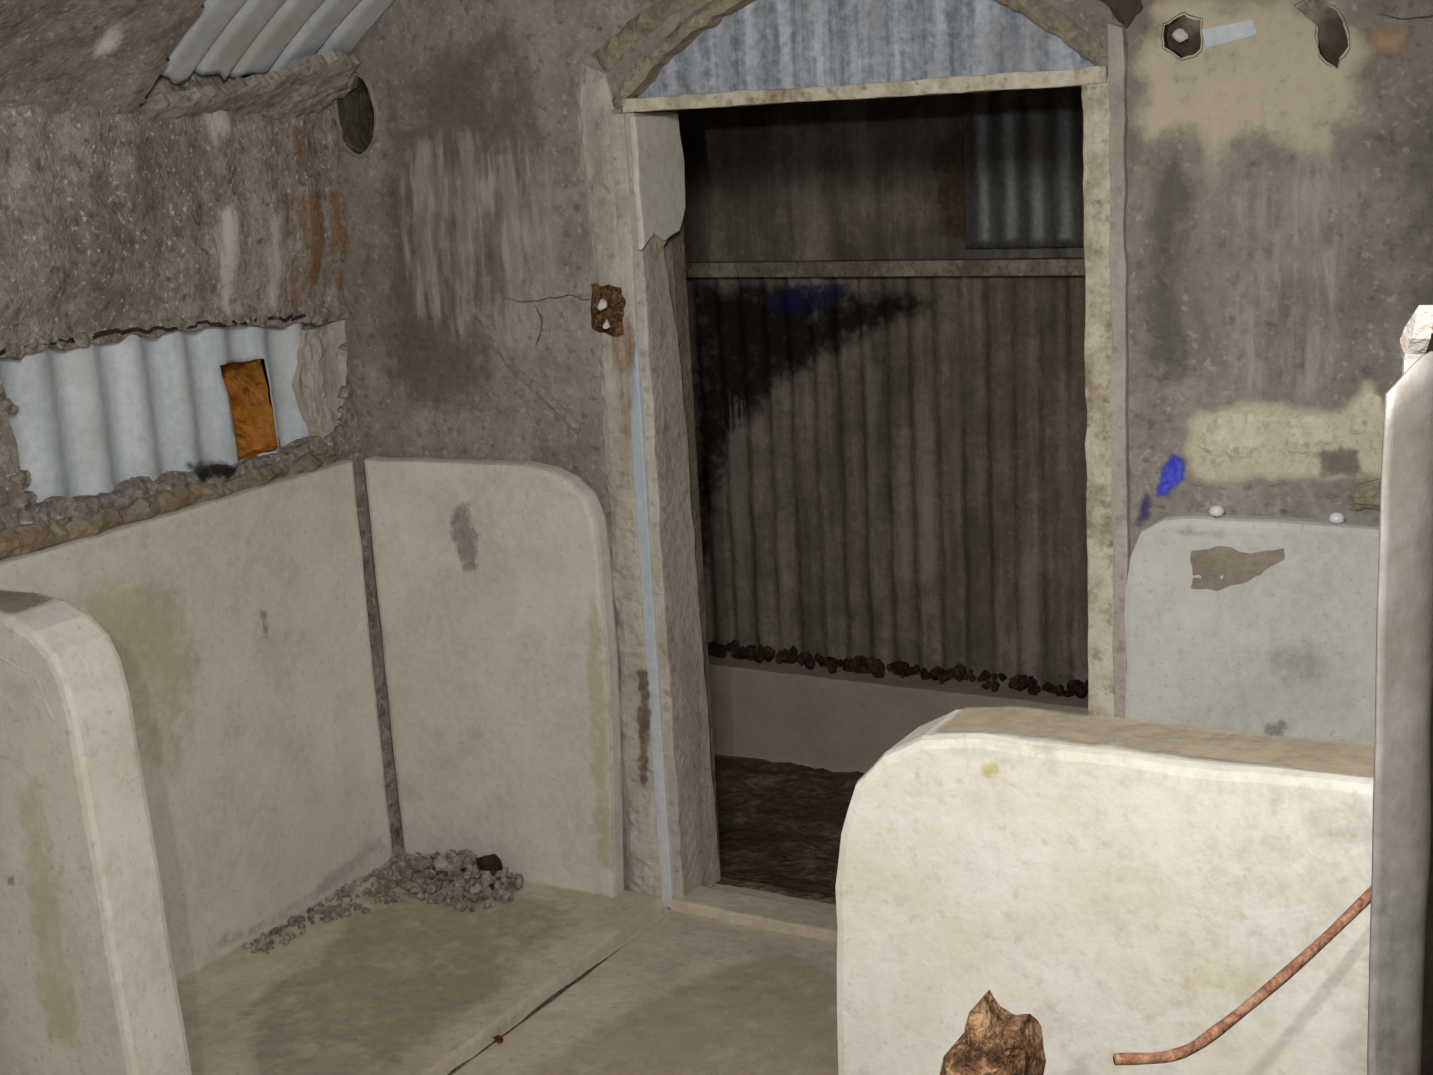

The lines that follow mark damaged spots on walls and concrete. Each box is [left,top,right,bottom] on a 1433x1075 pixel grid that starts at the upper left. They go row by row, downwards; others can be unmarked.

peeling [1099,0,1406,174]
damp [395,65,553,395]
spalling [0,307,354,560]
peeling [1181,380,1384,484]
spalling [1190,546,1285,591]